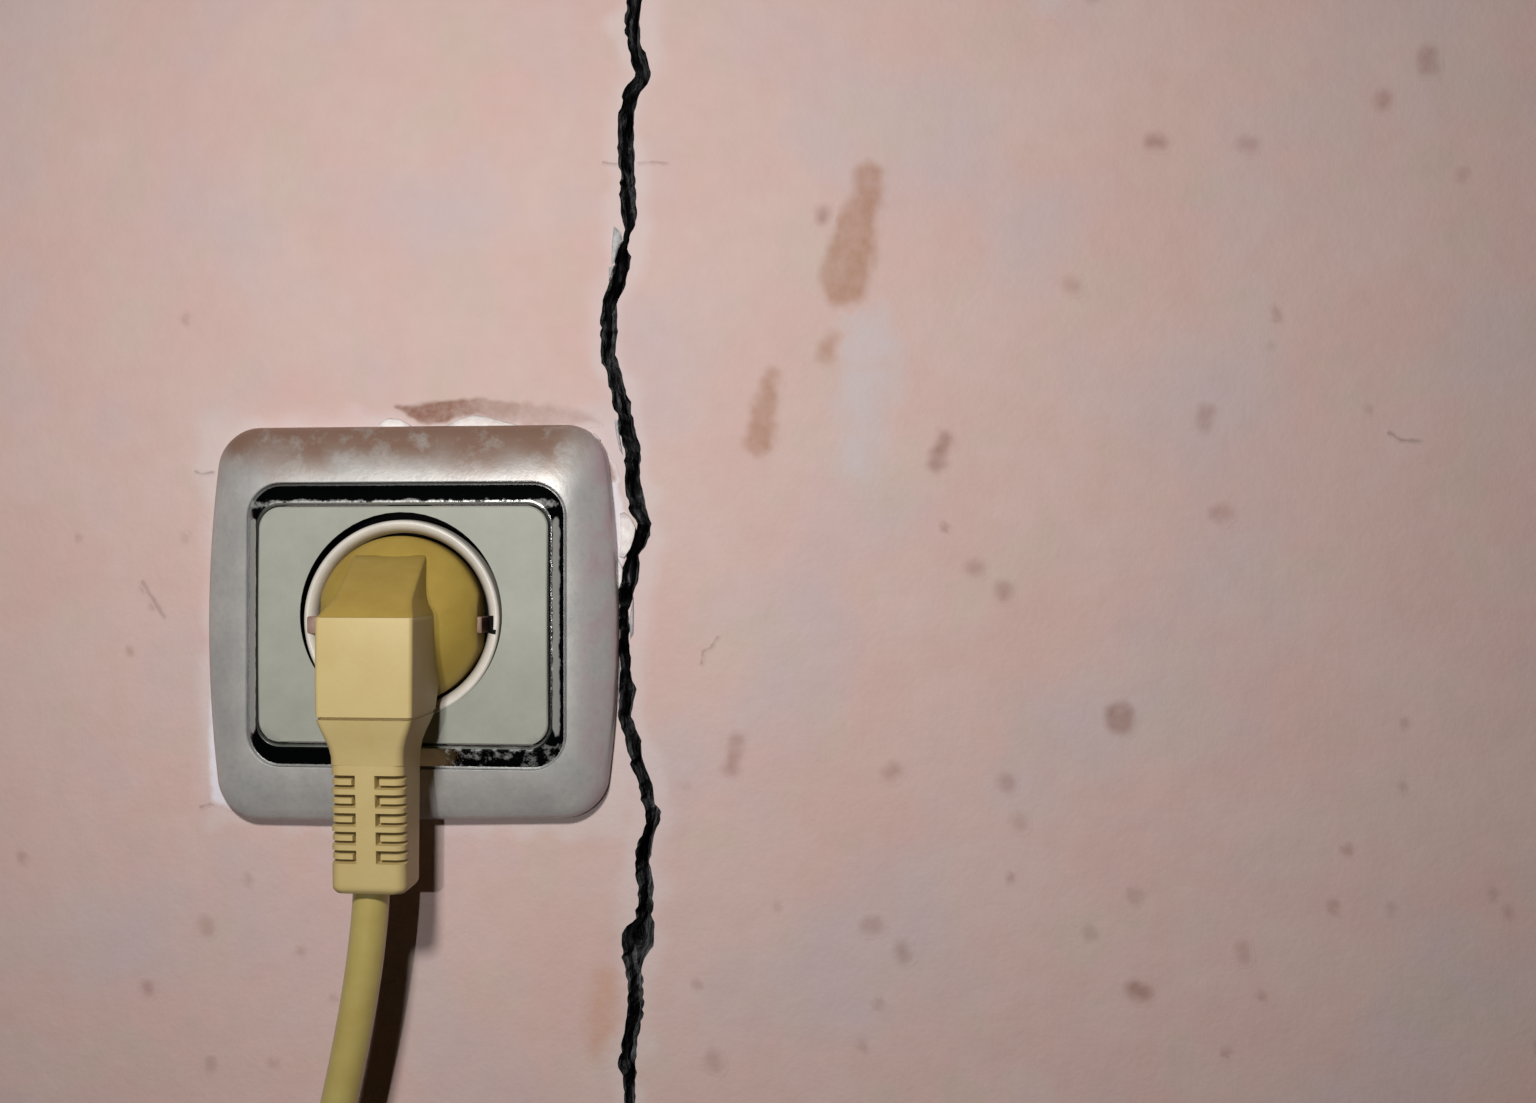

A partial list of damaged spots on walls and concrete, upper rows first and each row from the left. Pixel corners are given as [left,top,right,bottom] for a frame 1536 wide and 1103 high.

damp [810,155,890,370]
damp [738,363,787,464]
crack [600,0,669,1103]